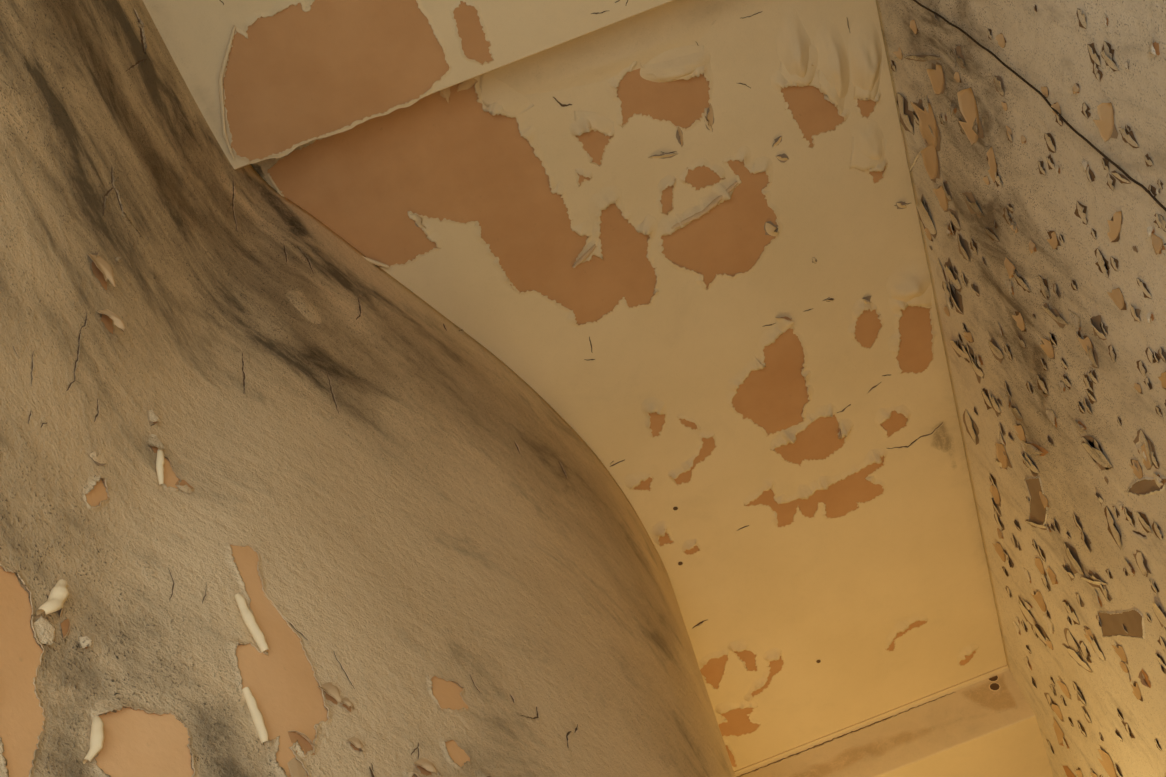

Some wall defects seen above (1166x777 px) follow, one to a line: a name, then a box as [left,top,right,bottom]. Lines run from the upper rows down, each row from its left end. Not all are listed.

damp [253,166,305,233]
peeling [215,0,789,327]
peeling [641,397,717,486]
peeling [725,316,854,466]
peeling [743,405,911,528]
peeling [770,41,1166,777]
peeling [651,520,701,555]
peeling [0,557,93,777]
peeling [83,697,201,777]
peeling [224,541,355,777]
peeling [402,737,517,777]
peeling [699,640,785,767]